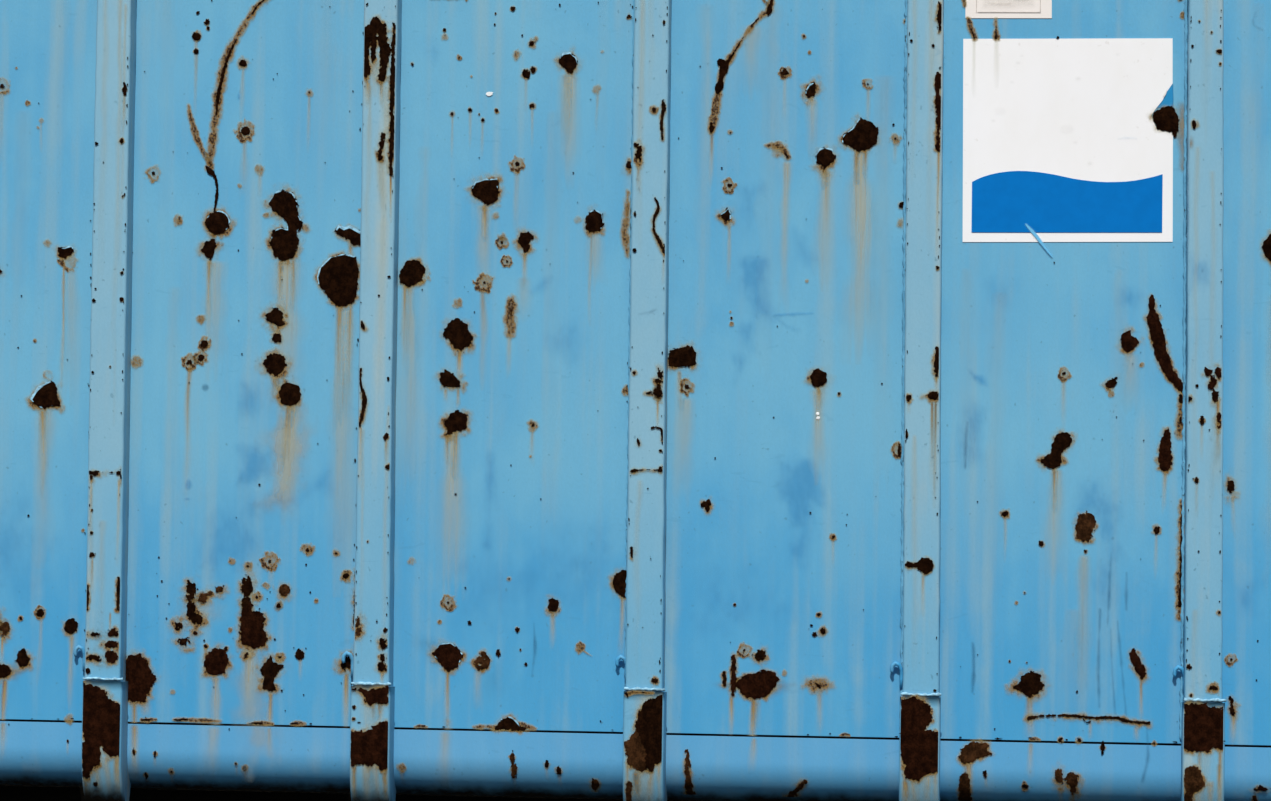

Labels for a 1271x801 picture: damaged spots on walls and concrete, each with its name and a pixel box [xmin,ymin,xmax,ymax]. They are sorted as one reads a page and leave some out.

rust [349,3,396,199]
rust [715,0,773,94]
rust [815,117,909,234]
rust [1150,106,1191,137]
rust [262,188,309,332]
rust [315,225,362,348]
rust [27,373,62,436]
rust [1037,431,1075,488]
rust [1120,303,1190,478]
rust [63,577,157,755]
rust [156,551,312,726]
rust [721,642,787,729]